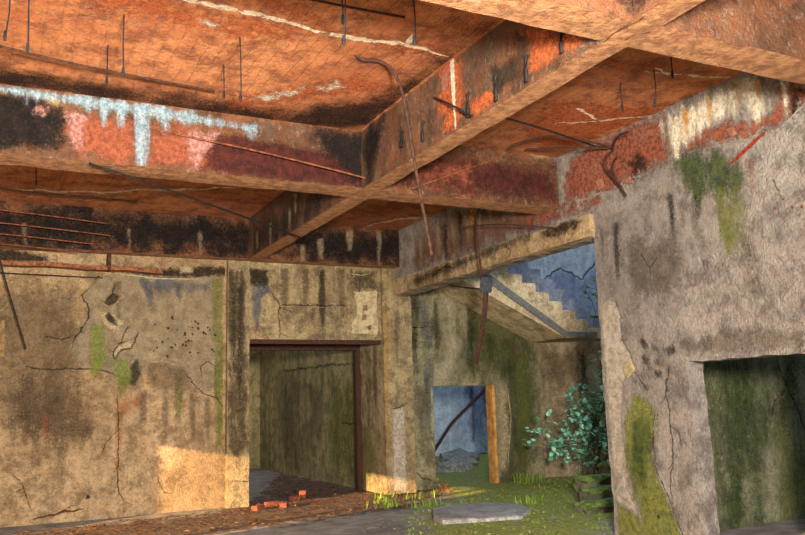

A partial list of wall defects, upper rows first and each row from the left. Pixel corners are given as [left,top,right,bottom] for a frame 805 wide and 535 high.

crack [184,0,449,57]
leakage [0,88,362,188]
spalling [685,83,805,153]
leakage [254,194,330,252]
leakage [693,185,702,215]
spalling [72,265,225,359]
flaking render [129,316,223,408]